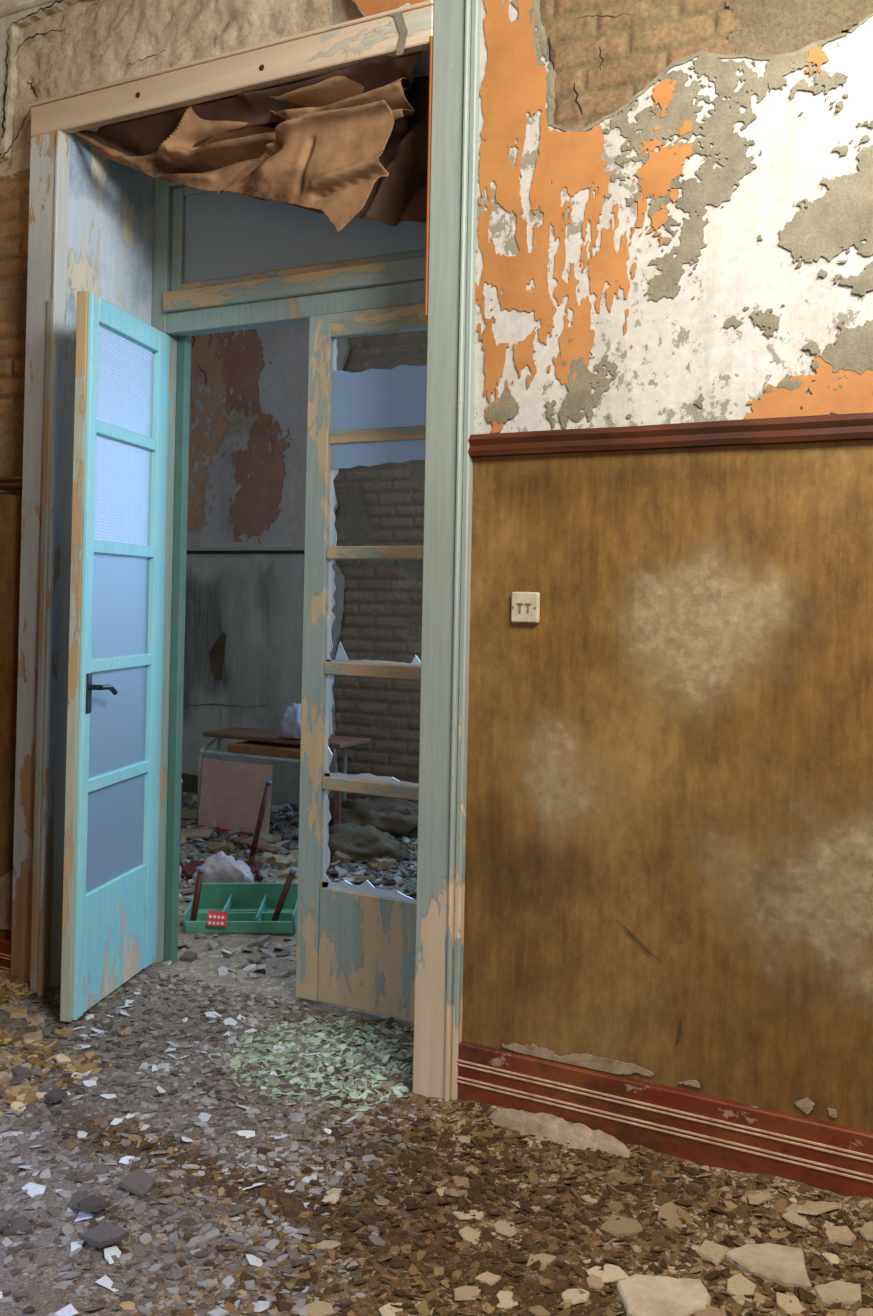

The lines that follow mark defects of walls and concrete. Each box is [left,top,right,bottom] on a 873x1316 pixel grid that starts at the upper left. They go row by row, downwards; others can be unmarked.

peeling [354,0,427,16]
spalling [0,0,333,477]
peeling [475,0,873,433]
peeling [187,329,291,546]
spalling [337,330,427,373]
spalling [331,460,425,784]
spalling [331,790,418,804]
peeling [502,1043,654,1077]